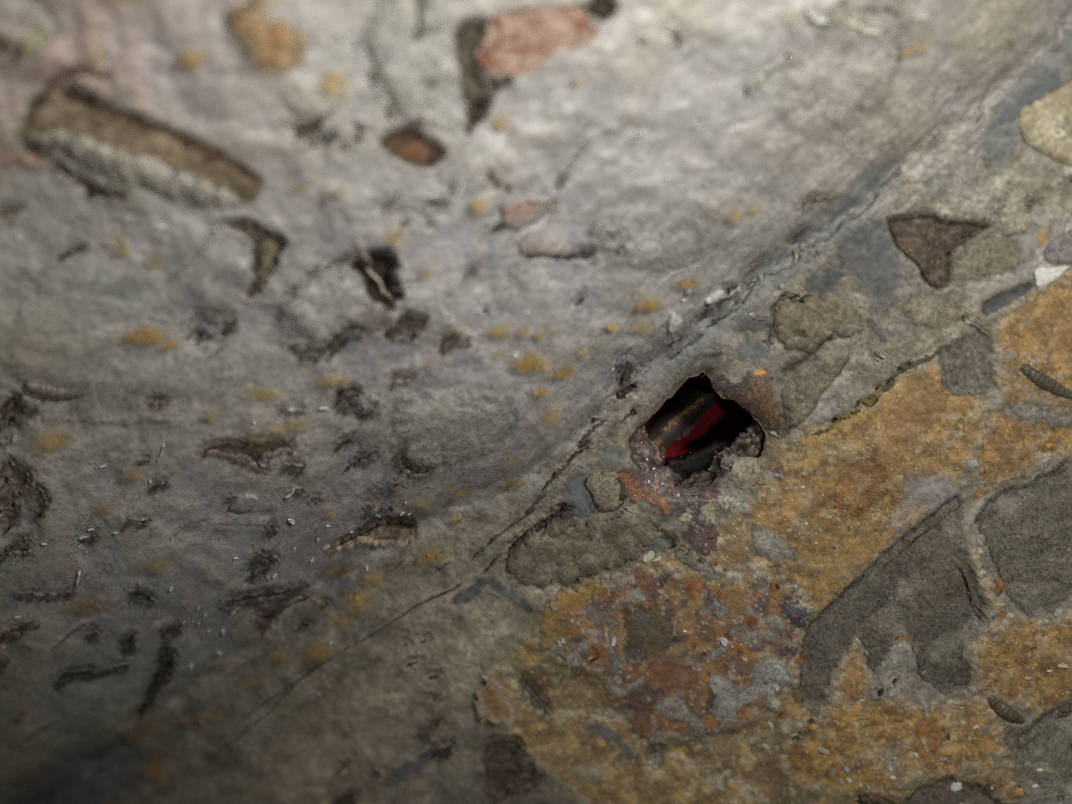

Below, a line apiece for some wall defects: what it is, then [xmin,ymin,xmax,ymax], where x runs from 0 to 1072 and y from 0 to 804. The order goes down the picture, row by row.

spalling [616,361,665,472]
rust [662,395,704,431]
crack [157,419,707,803]
rust [779,647,798,660]
rust [996,699,1043,735]
rust [658,667,859,804]
rust [989,735,1072,804]
rust [495,772,577,804]
rust [860,776,938,804]